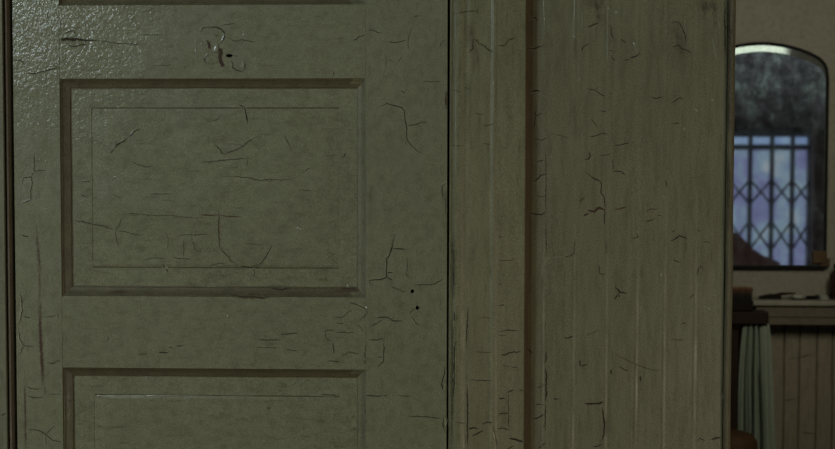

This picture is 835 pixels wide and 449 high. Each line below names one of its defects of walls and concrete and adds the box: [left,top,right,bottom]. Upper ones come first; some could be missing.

crack [47,14,161,49]
crack [110,128,153,168]
crack [200,104,326,198]
crack [378,90,426,154]
crack [579,87,630,300]
crack [74,192,290,299]
crack [324,234,559,449]